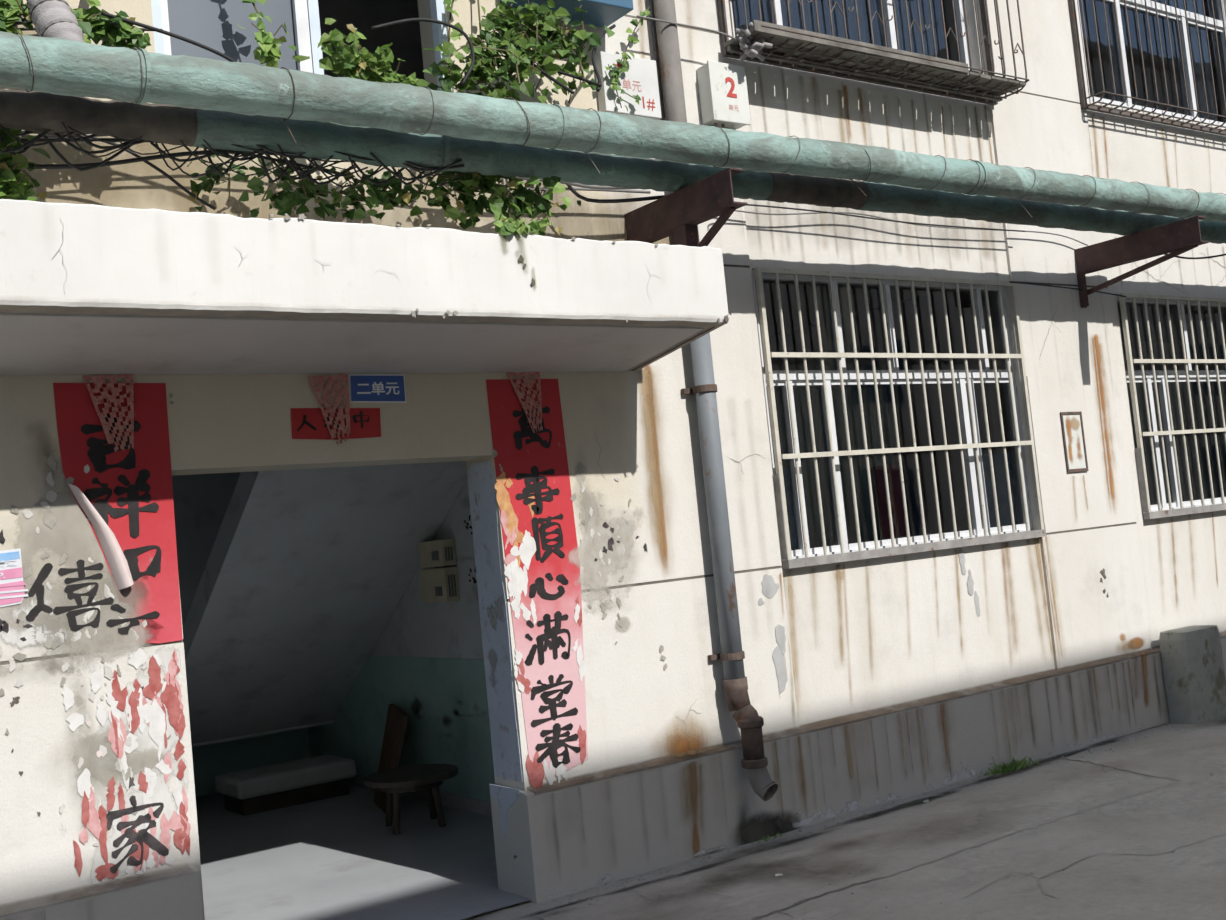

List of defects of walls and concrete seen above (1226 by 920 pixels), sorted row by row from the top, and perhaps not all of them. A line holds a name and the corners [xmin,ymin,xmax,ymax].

rust [641,365,666,561]
rust [1093,335,1114,499]
peeling [0,452,153,707]
peeling [569,463,647,644]
rust [1035,536,1060,649]
rust [1121,635,1148,703]
rust [667,725,702,854]